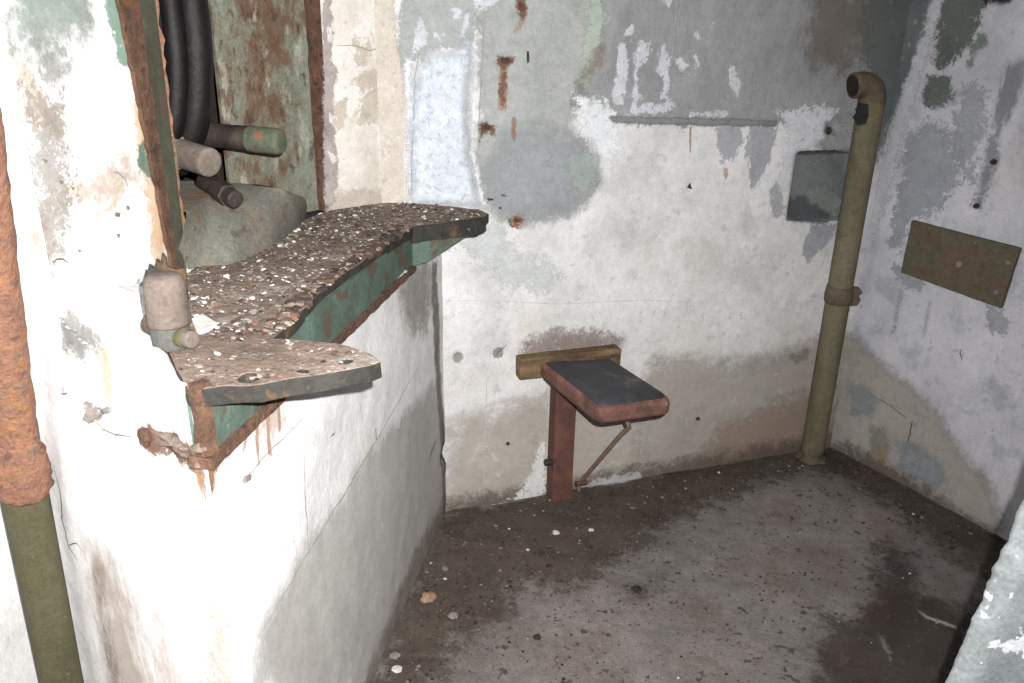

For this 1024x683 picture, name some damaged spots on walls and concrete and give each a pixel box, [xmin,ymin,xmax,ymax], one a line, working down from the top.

corrosion [515,0,528,28]
corrosion [144,172,166,261]
corrosion [478,121,496,142]
corrosion [497,55,516,140]
peeling [397,0,901,296]
peeling [885,81,992,292]
spalling [82,401,207,473]
corrosion [188,456,230,501]
corrosion [243,406,281,465]
water stain [447,400,550,510]
water stain [572,340,819,489]
crack [868,394,913,442]